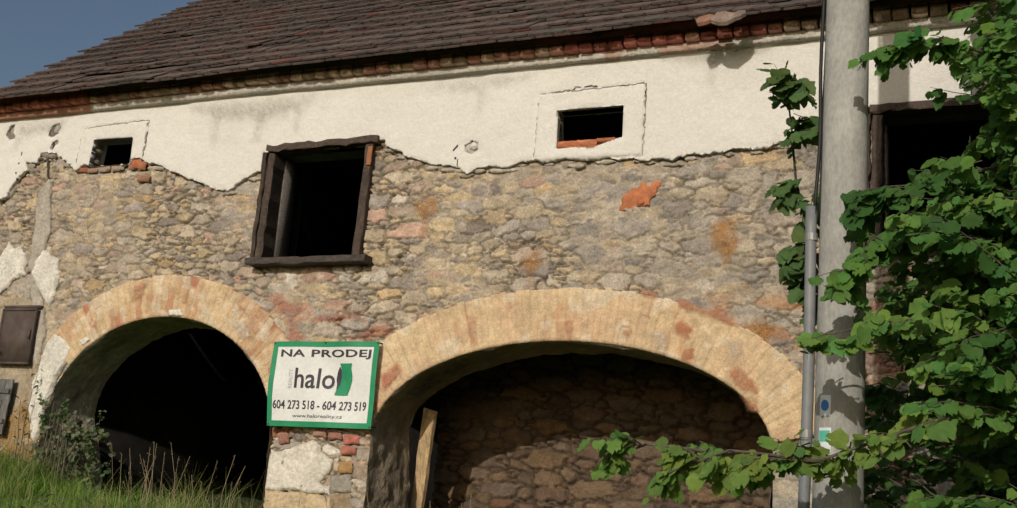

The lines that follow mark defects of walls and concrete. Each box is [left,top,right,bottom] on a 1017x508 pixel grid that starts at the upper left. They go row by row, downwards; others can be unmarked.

flaking render [28,124,84,173]
spalling [465,141,478,154]
flaking render [131,159,165,172]
flaking render [426,164,528,178]
flaking render [566,159,616,170]
flaking render [632,156,697,167]
flaking render [619,181,663,212]